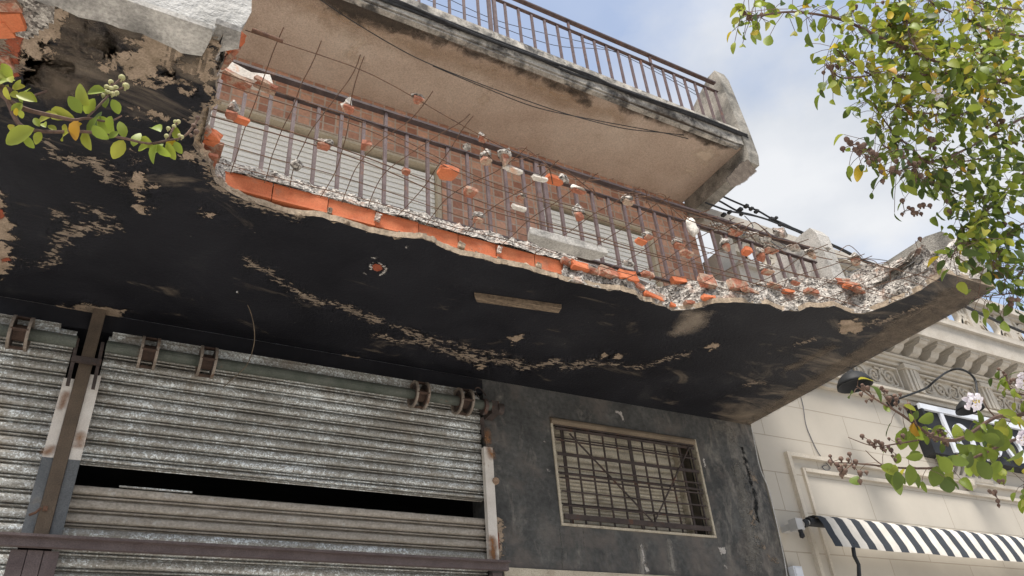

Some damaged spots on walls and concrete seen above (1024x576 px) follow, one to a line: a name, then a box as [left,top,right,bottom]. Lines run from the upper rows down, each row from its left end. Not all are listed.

flaking render [0,0,78,80]
peeling [41,137,160,215]
peeling [0,191,125,275]
spalling [91,27,987,419]
crack [714,423,779,571]